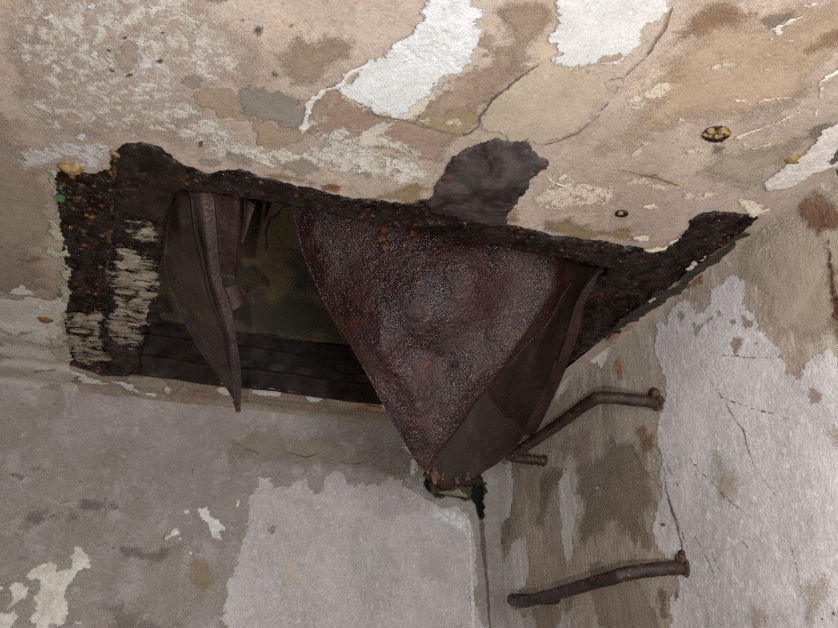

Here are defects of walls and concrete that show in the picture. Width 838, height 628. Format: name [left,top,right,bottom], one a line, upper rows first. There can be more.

peeling [1,0,677,187]
water stain [356,183,430,205]
water stain [542,216,637,243]
crack [546,7,673,145]
peeling [764,123,838,195]
rust [797,187,838,356]
peeling [0,546,91,628]
spalling [403,443,488,628]
rust [656,587,679,622]
crack [629,440,745,583]
peeling [555,213,838,628]
crack [720,394,802,494]